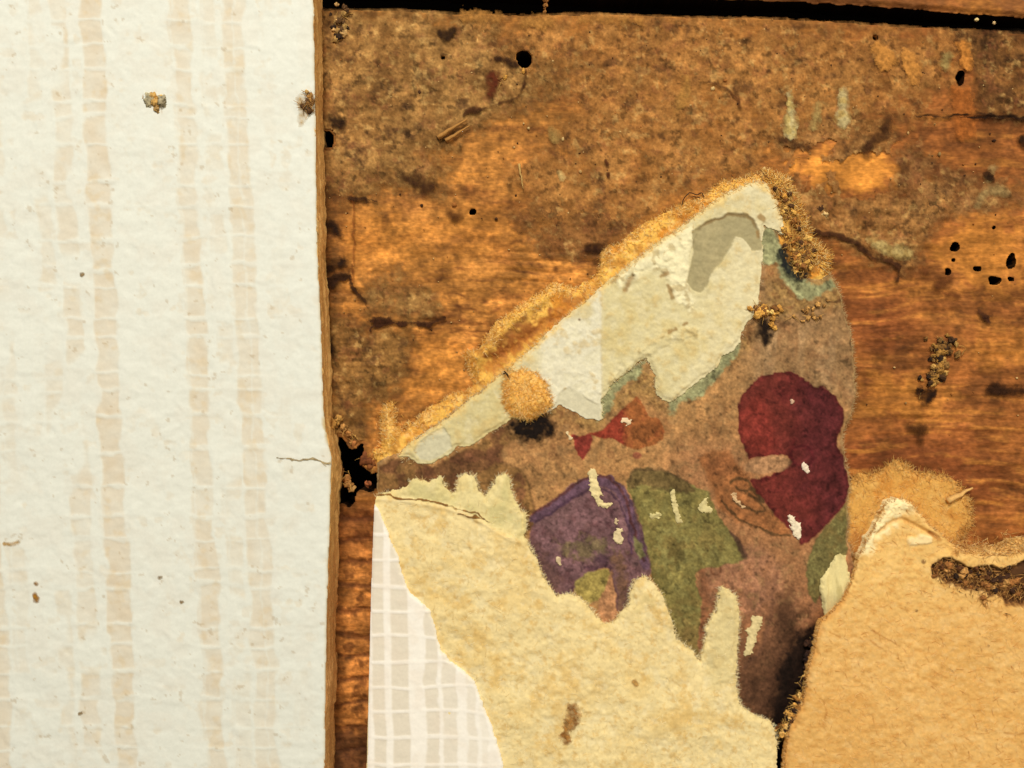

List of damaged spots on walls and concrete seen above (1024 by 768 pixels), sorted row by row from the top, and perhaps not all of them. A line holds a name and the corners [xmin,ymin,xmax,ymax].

peeling [397,178,786,464]
damp [916,387,938,405]
crack [276,457,331,466]